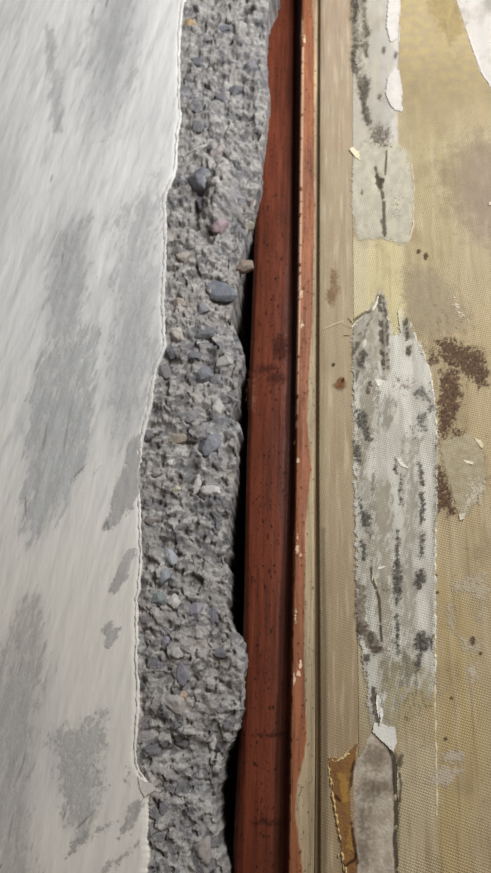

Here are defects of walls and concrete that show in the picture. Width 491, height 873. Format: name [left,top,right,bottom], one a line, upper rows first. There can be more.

peeling [385,0,491,112]
leakage [370,125,392,147]
flaking render [349,138,414,246]
spalling [102,0,280,873]
leakage [382,319,490,658]
flaking render [344,291,486,873]
leakage [413,630,434,671]
flaking render [47,708,111,858]